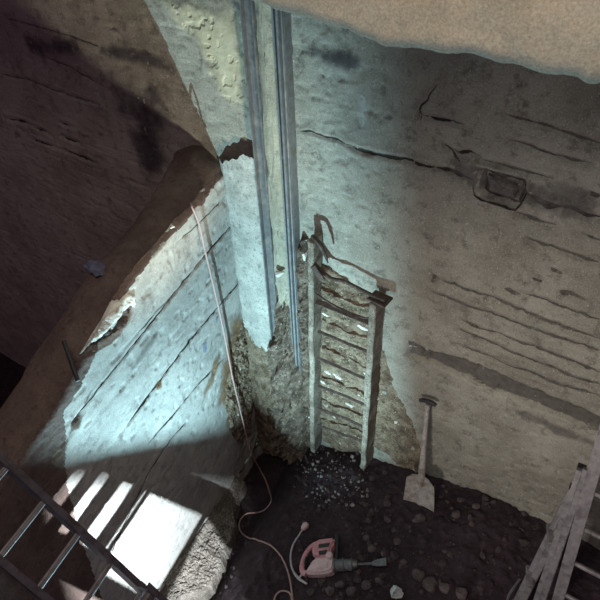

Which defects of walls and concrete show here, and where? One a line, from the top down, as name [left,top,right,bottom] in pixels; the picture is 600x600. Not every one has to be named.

water stain [102,47,169,69]
water stain [121,87,162,172]
crack [419,86,464,125]
crack [299,130,600,217]
spalling [80,293,136,355]
crack [71,227,238,424]
spalling [225,318,254,445]
spalling [296,234,310,448]
spalling [320,264,369,452]
spalling [373,349,421,473]